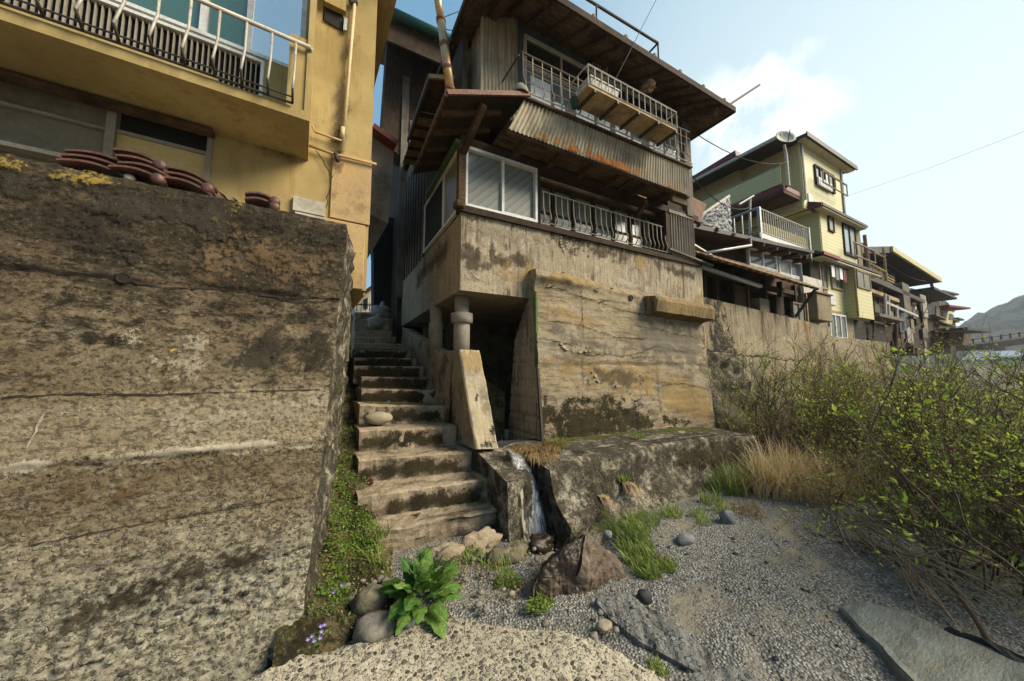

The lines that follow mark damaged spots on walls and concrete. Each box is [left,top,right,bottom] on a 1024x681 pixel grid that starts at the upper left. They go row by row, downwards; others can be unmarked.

corrosion [534,126,643,176]
water stain [460,218,695,292]
water stain [541,303,711,420]
crack [0,389,321,398]
crack [28,497,299,546]